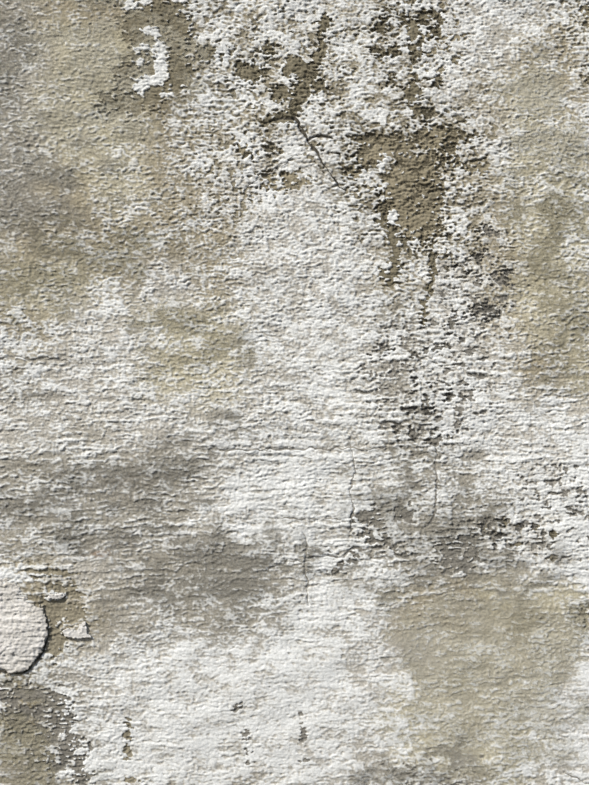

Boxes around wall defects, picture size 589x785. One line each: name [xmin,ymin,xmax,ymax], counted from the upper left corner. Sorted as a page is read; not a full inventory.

crack [247,116,347,191]
peeling [94,0,523,456]
peeling [22,562,92,666]
damp [403,587,589,768]
damp [351,768,372,785]
damp [386,765,442,785]